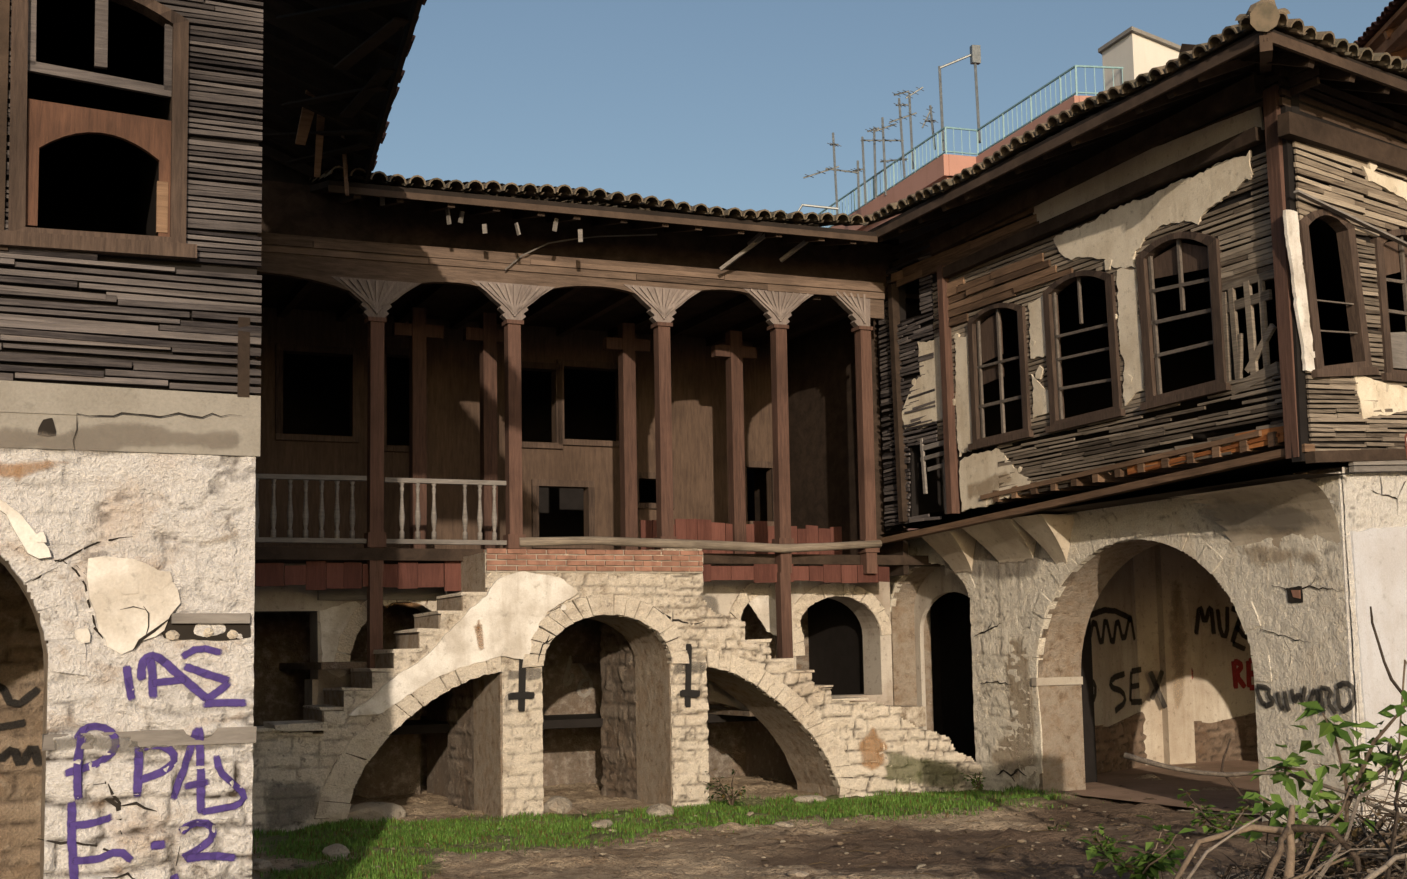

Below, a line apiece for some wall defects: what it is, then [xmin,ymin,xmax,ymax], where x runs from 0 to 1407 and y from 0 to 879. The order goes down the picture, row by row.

peeling [1361,162,1407,202]
peeling [1033,107,1265,406]
peeling [1283,210,1315,372]
crack [73,412,240,450]
peeling [1352,376,1407,419]
peeling [0,499,51,559]
peeling [74,556,251,654]
spalling [986,657,1043,781]